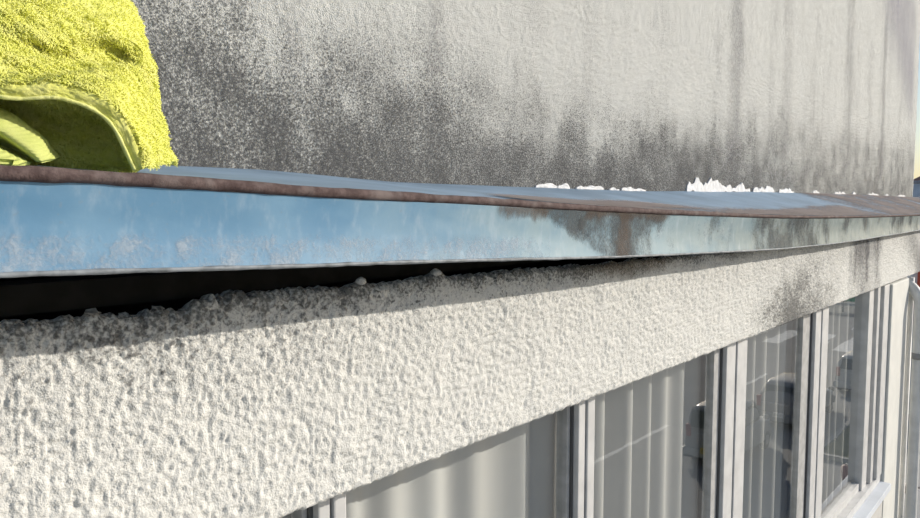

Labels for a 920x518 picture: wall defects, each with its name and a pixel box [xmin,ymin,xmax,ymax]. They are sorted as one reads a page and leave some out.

water stain [132,0,914,197]
water stain [761,270,833,331]